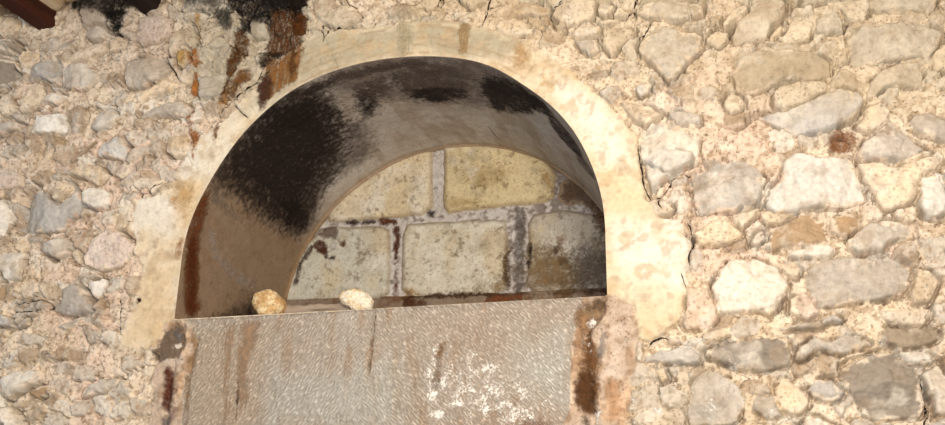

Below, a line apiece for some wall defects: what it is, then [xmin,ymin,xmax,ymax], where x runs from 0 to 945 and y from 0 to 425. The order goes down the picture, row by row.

rust [219,9,309,111]
damp [319,226,337,249]
damp [402,182,607,299]
damp [424,328,549,425]